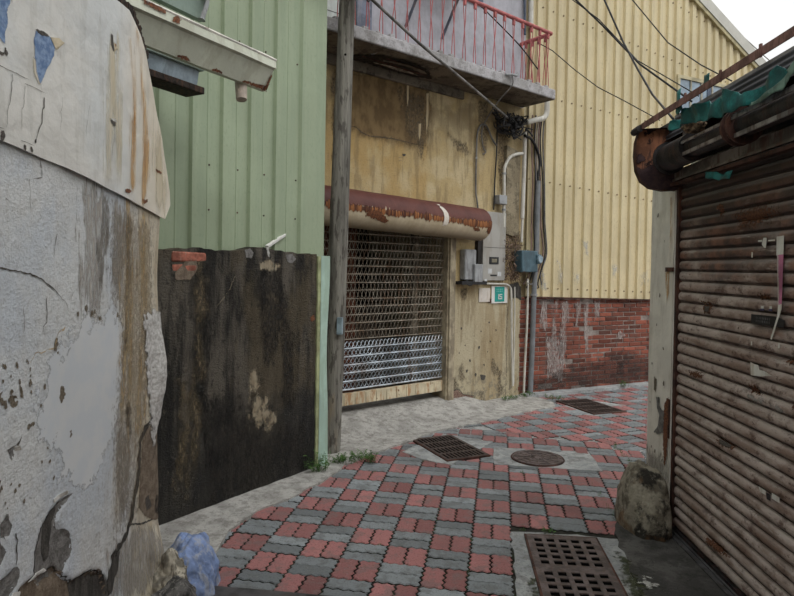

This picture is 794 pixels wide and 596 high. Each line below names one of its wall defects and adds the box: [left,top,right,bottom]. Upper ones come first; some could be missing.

peeling [0,0,12,55]
peeling [33,29,64,83]
rust [144,0,182,24]
rust [637,153,679,191]
rust [349,204,492,234]
crack [0,267,83,330]
water stain [76,182,154,525]
water stain [172,260,310,505]
spalling [249,370,276,430]
water stain [525,298,649,390]
crack [111,402,158,561]
spalling [0,491,164,596]